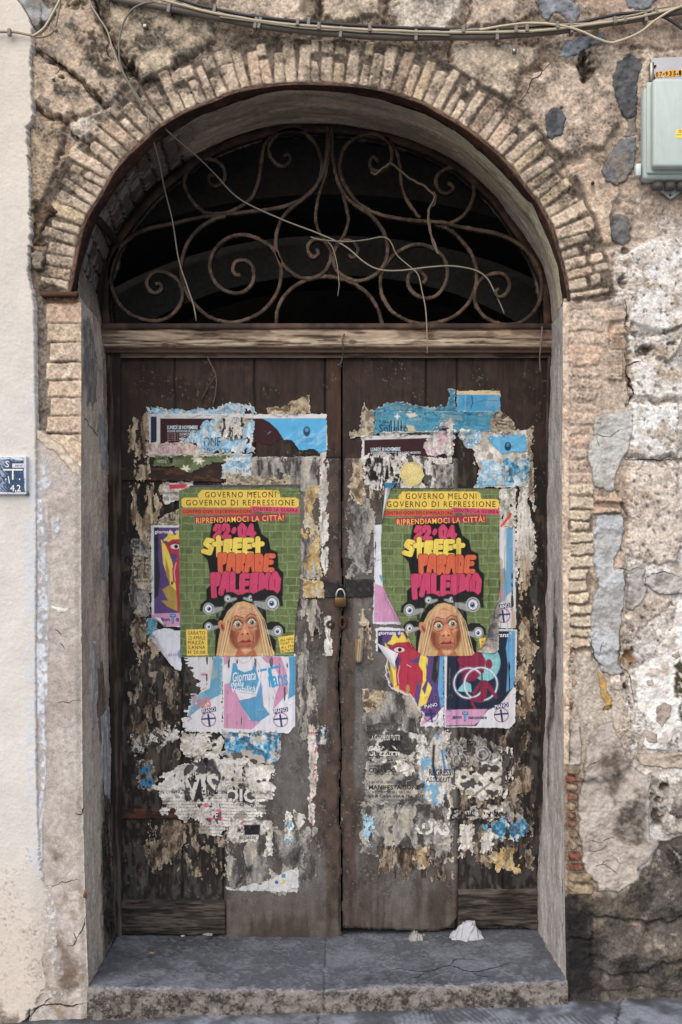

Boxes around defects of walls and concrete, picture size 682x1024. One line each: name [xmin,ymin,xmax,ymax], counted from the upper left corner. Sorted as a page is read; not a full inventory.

peeling [37,430,81,480]
peeling [566,599,682,895]
crack [383,958,507,978]
crack [30,998,83,1020]